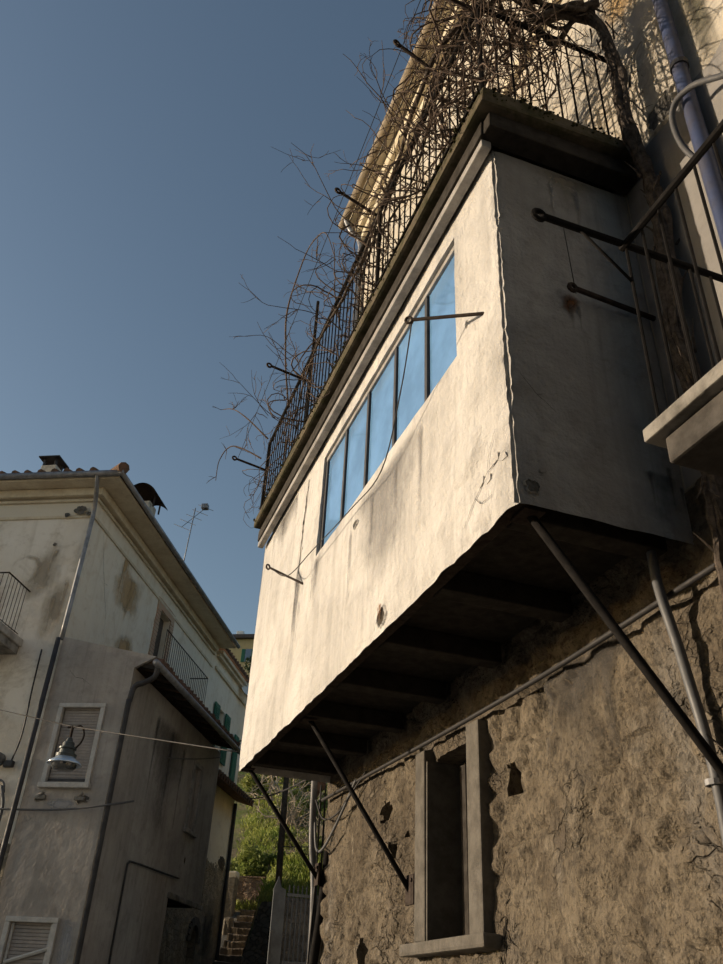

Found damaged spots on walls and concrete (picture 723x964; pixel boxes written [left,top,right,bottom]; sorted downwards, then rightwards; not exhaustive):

leakage [682,0,709,46]
crack [464,437,508,528]